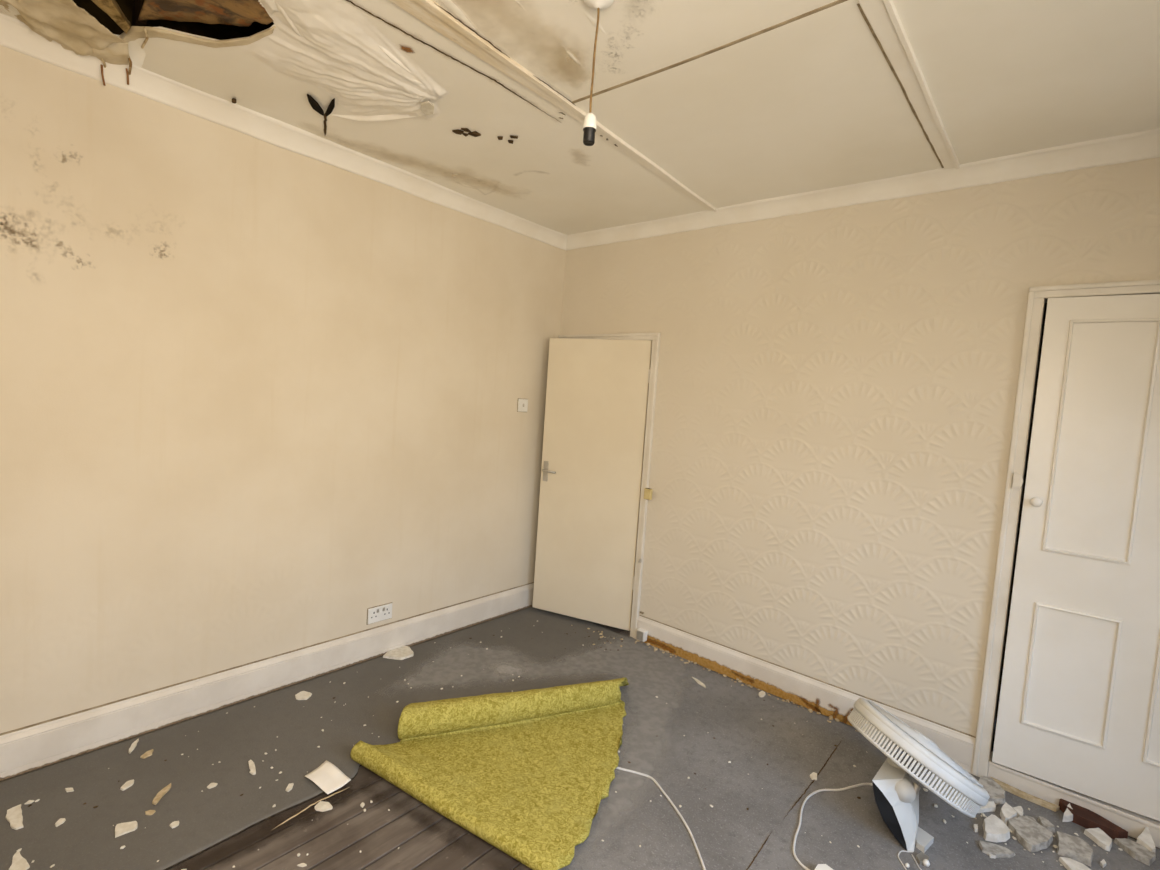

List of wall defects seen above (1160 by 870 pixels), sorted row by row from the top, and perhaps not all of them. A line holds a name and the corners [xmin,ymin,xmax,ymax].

spalling [90,42,129,65]